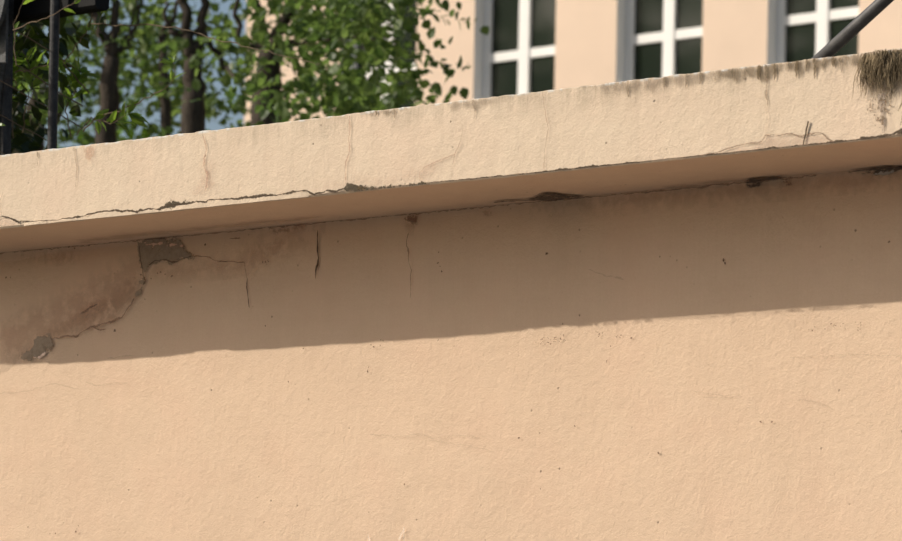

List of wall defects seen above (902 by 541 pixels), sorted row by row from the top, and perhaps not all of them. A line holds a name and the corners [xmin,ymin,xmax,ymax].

leakage [717,56,858,106]
crack [682,128,902,158]
crack [430,161,650,183]
crack [1,188,345,226]
peeling [135,237,193,297]
crack [313,230,321,278]
peeling [21,333,54,361]